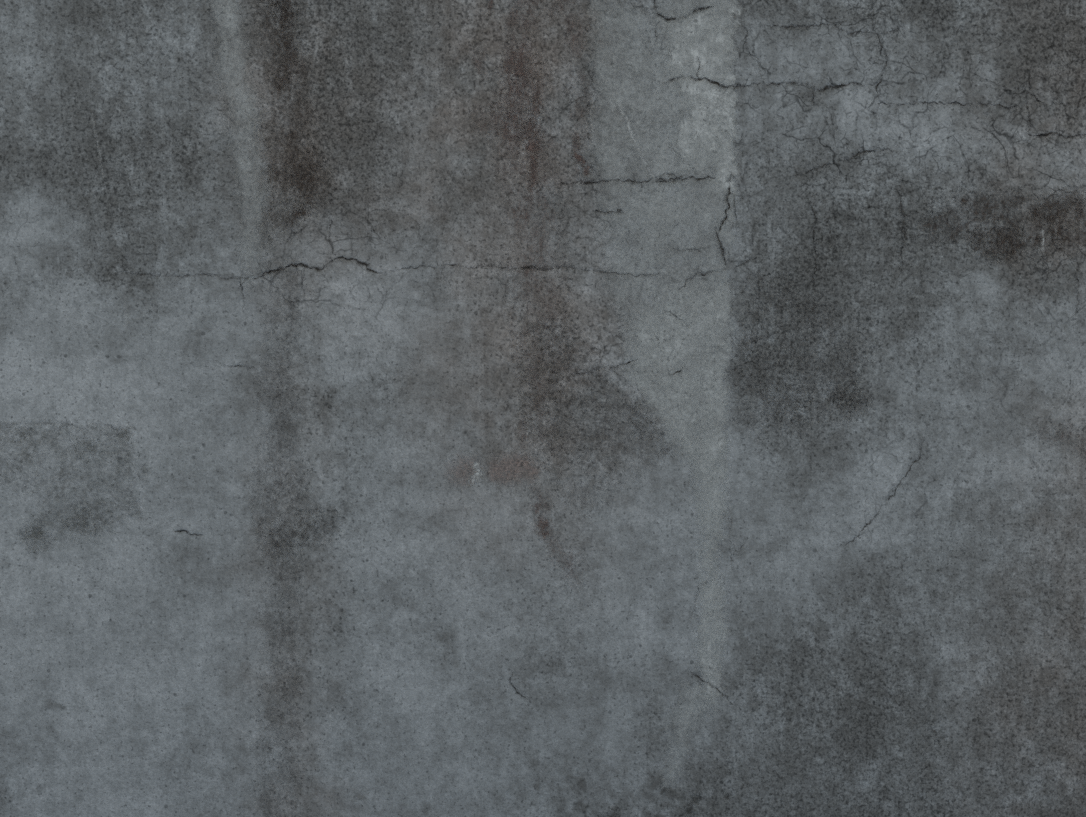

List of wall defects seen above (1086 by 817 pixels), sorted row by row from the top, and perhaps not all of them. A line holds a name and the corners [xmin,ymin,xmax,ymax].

crack [654,0,714,39]
damp [602,4,740,219]
crack [801,149,888,176]
crack [669,23,1086,139]
crack [141,220,650,293]
crack [562,173,750,287]
damp [635,282,731,523]